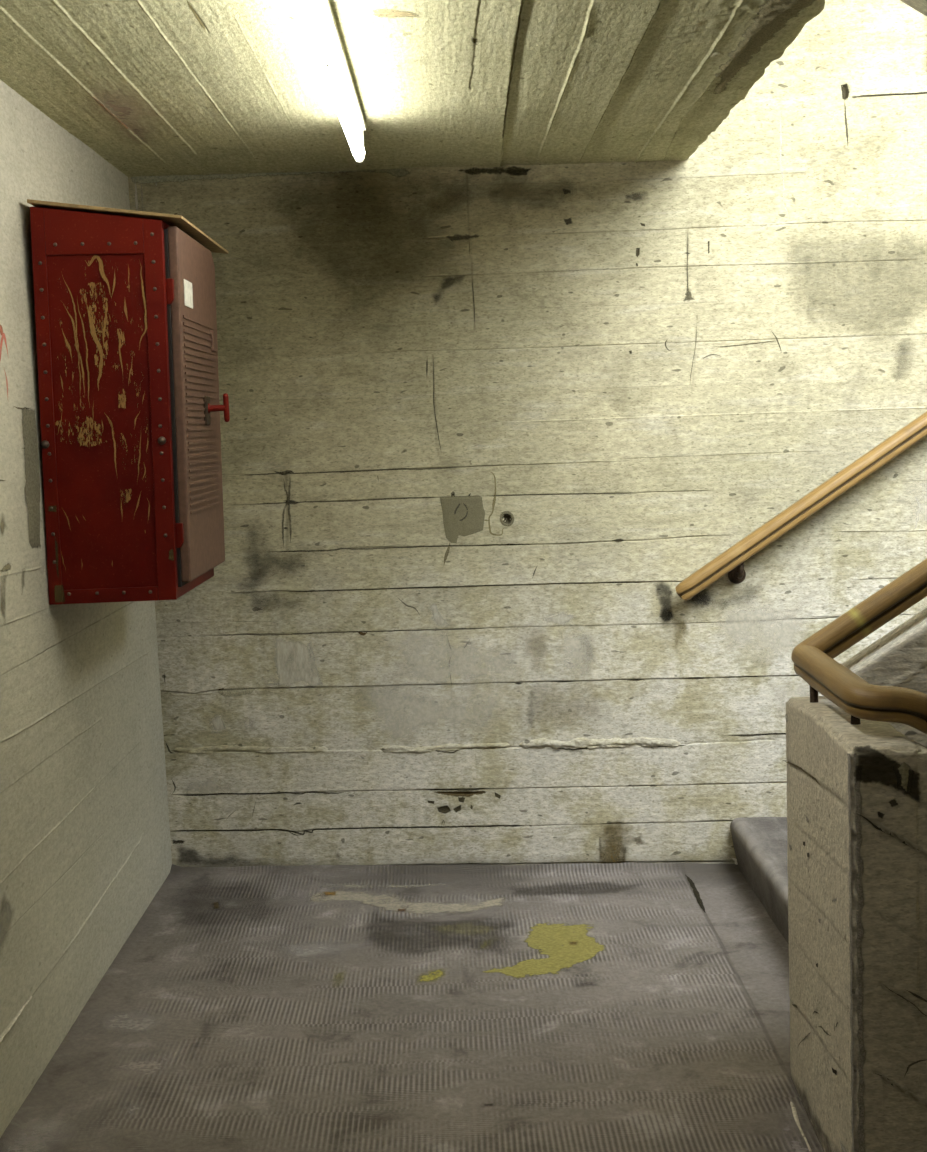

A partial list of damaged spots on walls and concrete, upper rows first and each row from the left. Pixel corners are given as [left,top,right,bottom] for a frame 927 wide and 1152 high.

spalling [841,84,850,144]
water stain [460,166,531,175]
water stain [657,583,685,641]